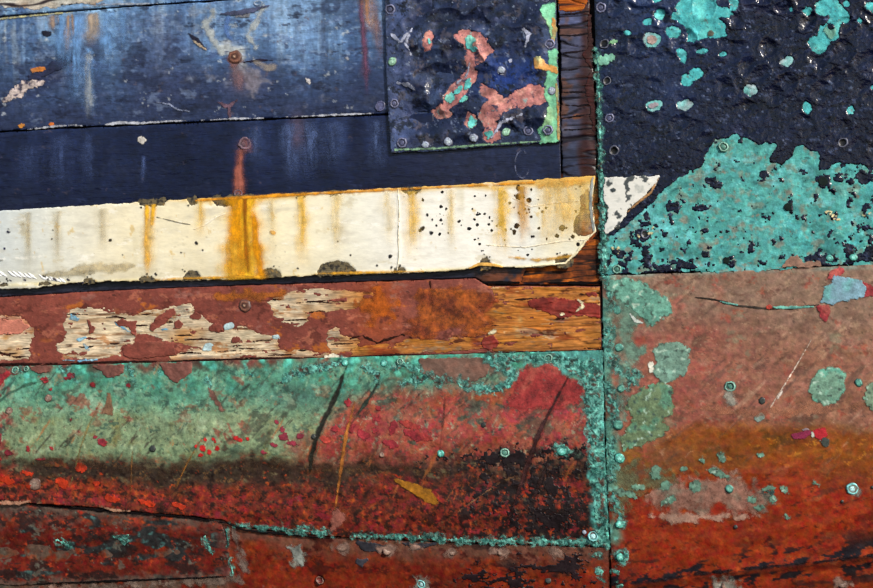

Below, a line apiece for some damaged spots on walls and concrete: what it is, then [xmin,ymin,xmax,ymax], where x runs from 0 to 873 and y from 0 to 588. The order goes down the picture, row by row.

peeling [643,0,739,86]
peeling [391,2,560,151]
corrosion [144,204,156,264]
corrosion [167,140,420,301]
peeling [55,134,873,387]
corrosion [497,181,535,233]
corrosion [521,178,600,283]
peeling [507,363,583,415]
peeling [808,366,847,406]
crack [0,500,318,538]
corrosion [394,479,438,505]
crack [37,576,226,584]